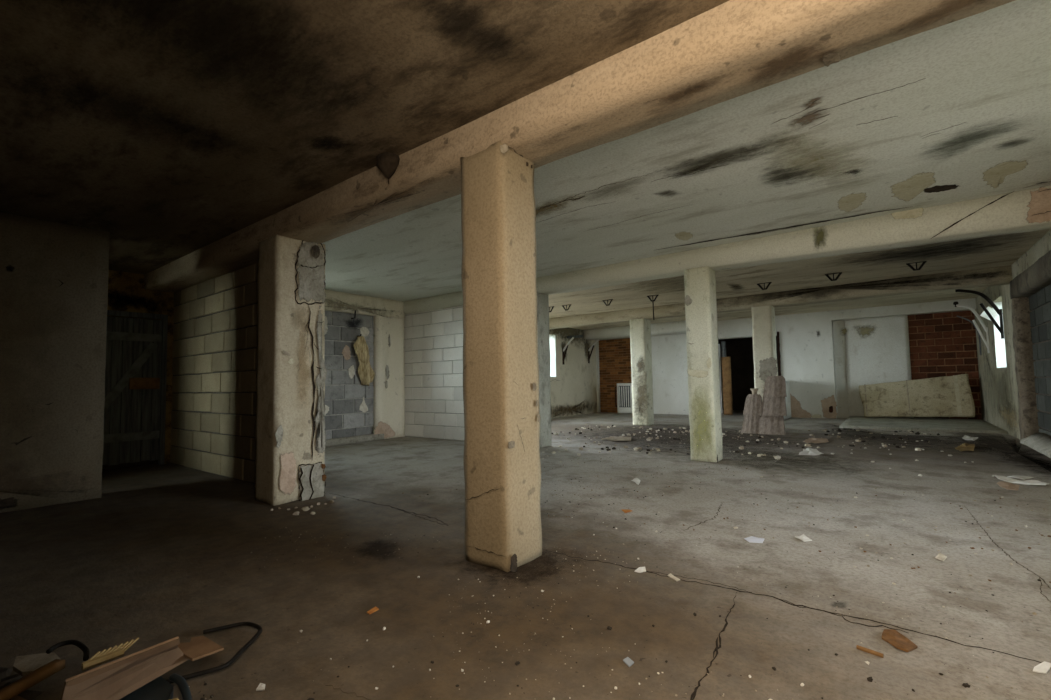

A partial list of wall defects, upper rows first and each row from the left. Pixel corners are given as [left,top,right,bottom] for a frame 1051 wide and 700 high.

water stain [674,145,763,175]
water stain [767,149,860,183]
peeling [890,172,936,219]
water stain [936,128,1025,156]
crack [932,181,1051,238]
peeling [983,160,1028,188]
spalling [294,240,326,305]
crack [299,305,448,526]
peeling [275,425,327,501]
crack [965,507,1051,602]
crack [550,551,1042,700]